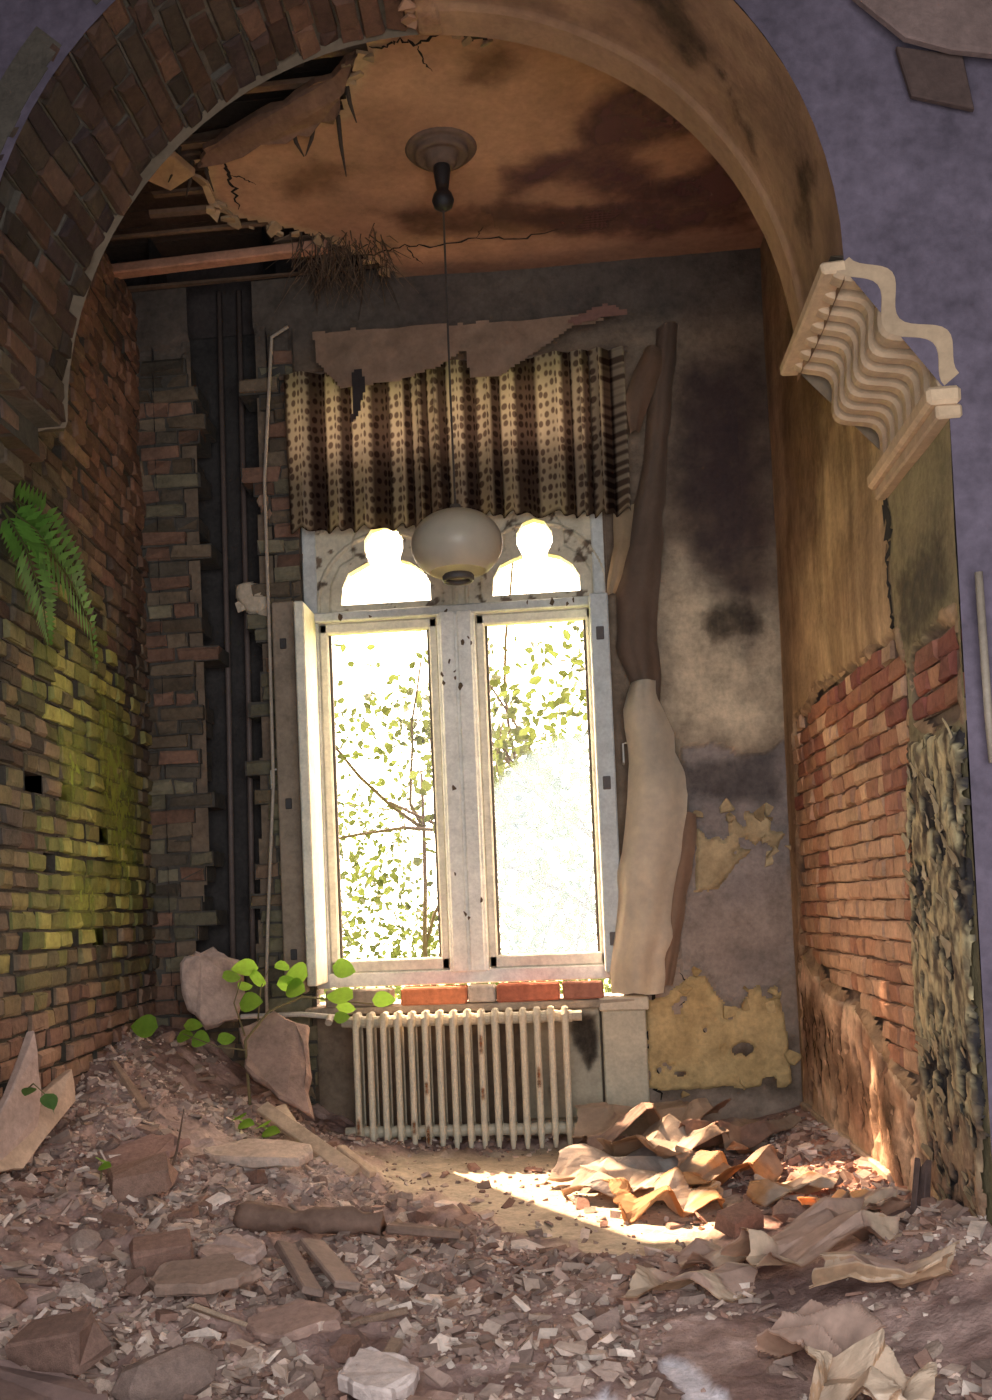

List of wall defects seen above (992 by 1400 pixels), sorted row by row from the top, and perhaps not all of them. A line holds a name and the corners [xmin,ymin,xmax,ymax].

peeling [341,49,371,86]
crack [369,35,439,71]
leakage [399,87,748,239]
leakage [707,607,761,638]
spalling [693,603,990,1218]
peeling [646,966,801,1098]